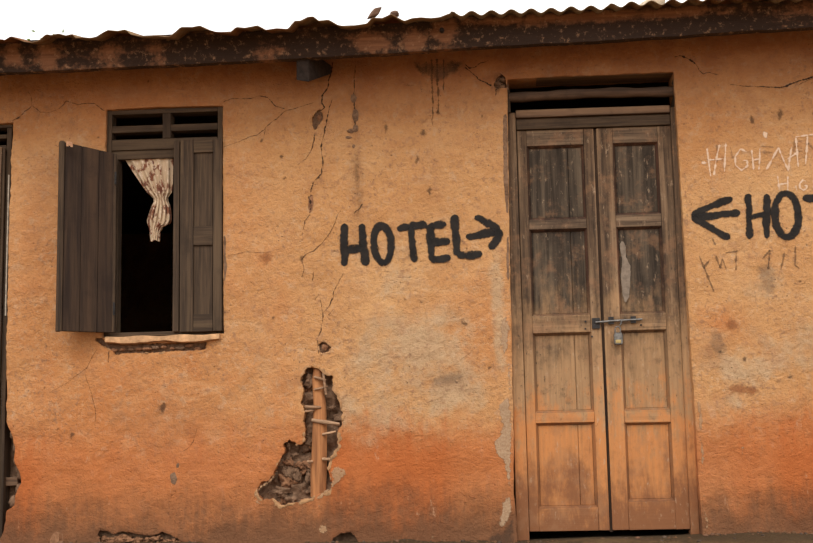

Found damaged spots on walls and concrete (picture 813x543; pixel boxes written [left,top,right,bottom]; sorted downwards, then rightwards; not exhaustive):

crack [675,55,813,88]
crack [224,62,333,229]
spalling [311,110,323,132]
crack [301,204,363,354]
spalling [96,337,207,355]
spalling [6,432,21,509]
spalling [254,366,345,509]
flaking render [495,364,512,480]
spalling [99,531,179,543]
flaking render [499,498,511,527]